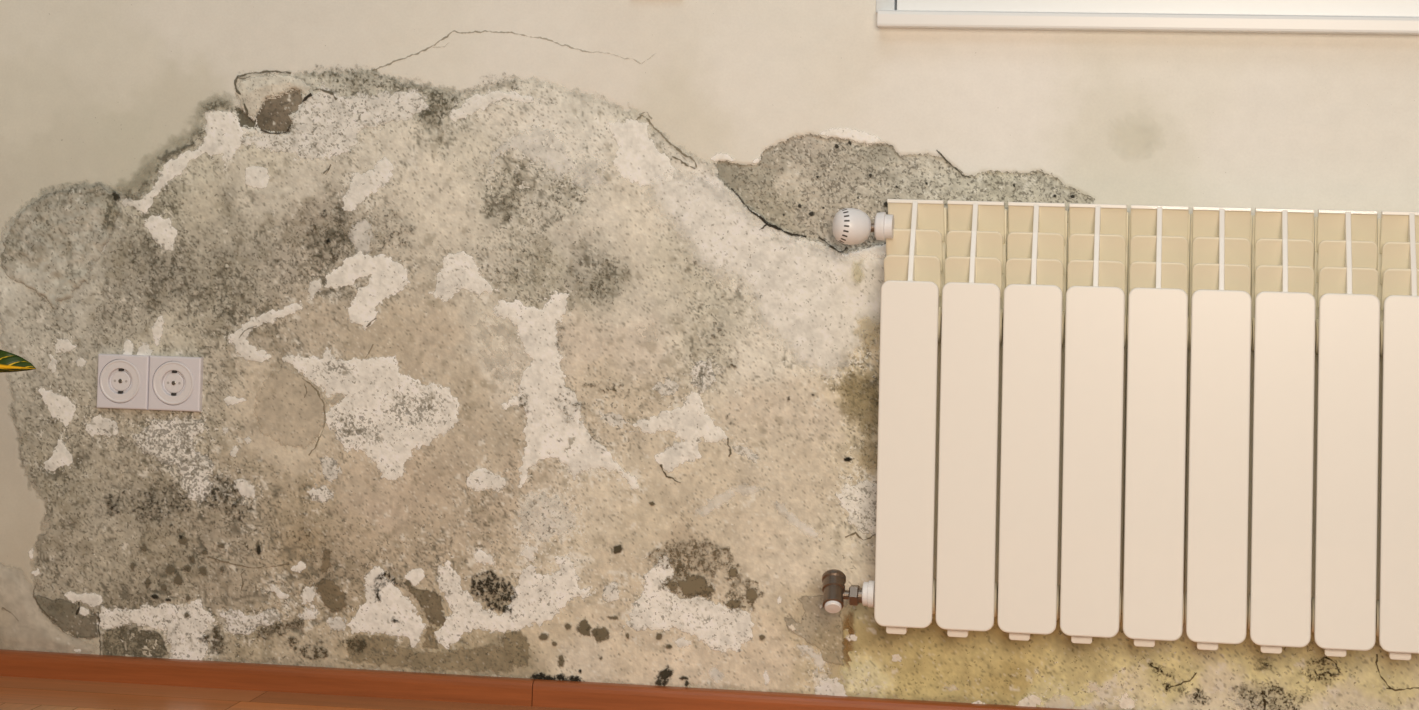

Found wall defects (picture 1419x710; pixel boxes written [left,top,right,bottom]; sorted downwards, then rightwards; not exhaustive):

crack [371,30,639,71]
flaking render [0,69,1095,696]
damp [106,492,224,617]
damp [471,570,517,613]
damp [649,539,763,610]
damp [204,627,228,653]
damp [257,619,327,660]
damp [531,633,581,682]
damp [565,616,618,660]
damp [655,666,689,686]
damp [840,603,1419,710]
crack [1375,654,1419,691]